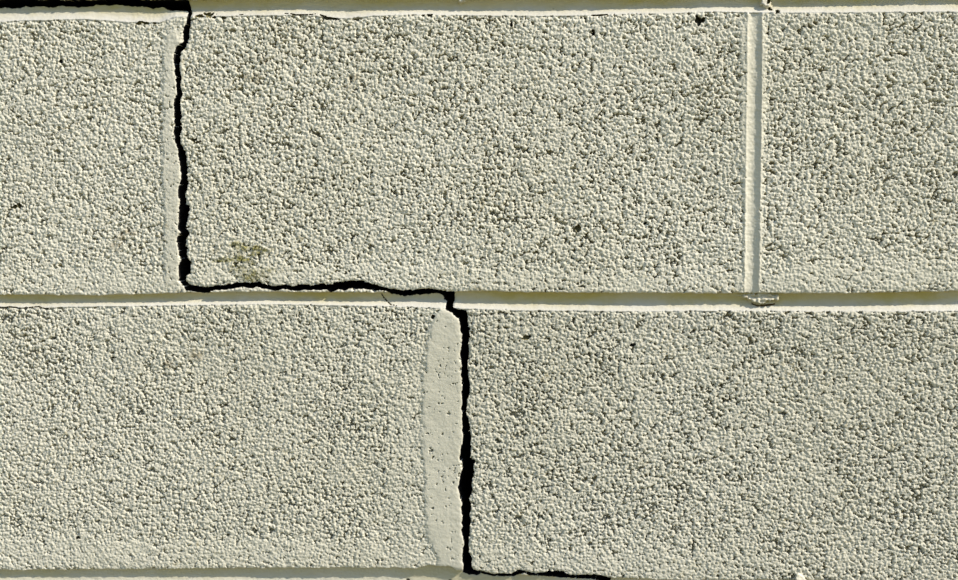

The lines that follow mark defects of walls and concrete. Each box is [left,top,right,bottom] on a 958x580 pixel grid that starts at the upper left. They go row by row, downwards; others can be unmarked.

crack [0,0,611,580]